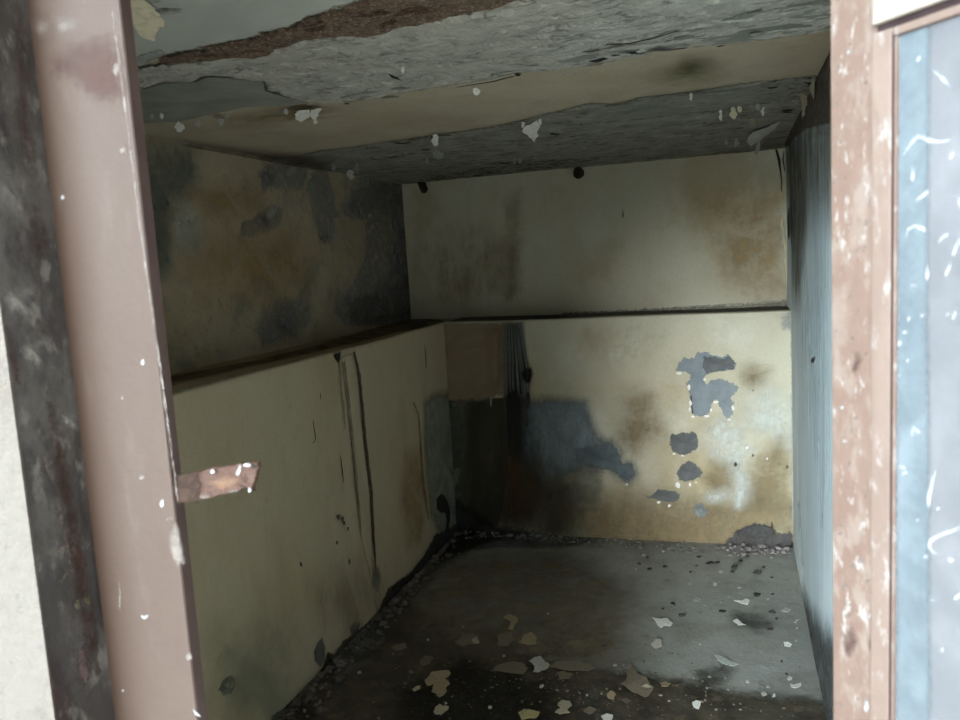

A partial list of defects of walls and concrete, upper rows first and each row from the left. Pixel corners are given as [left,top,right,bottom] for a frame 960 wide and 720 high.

flaking render [130,0,831,132]
damp [147,147,327,267]
damp [717,119,832,502]
damp [171,306,833,720]
peeling [523,399,635,486]
peeling [644,431,703,507]
peeling [676,352,740,421]